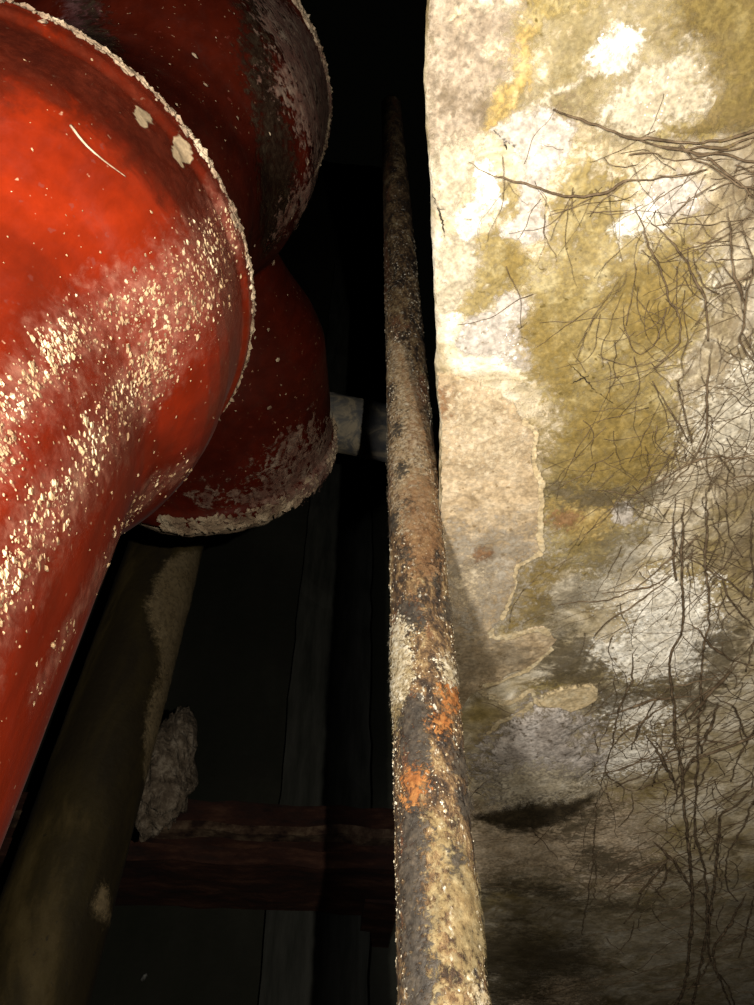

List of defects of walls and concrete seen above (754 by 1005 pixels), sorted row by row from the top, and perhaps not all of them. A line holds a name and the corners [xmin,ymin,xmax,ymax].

leakage [431,21,716,313]
leakage [455,291,531,371]
rust [437,388,455,420]
leakage [545,332,754,543]
peeling [437,364,616,833]
rust [424,680,463,741]
leakage [470,553,753,915]
rust [399,764,434,812]
leakage [464,918,605,1005]